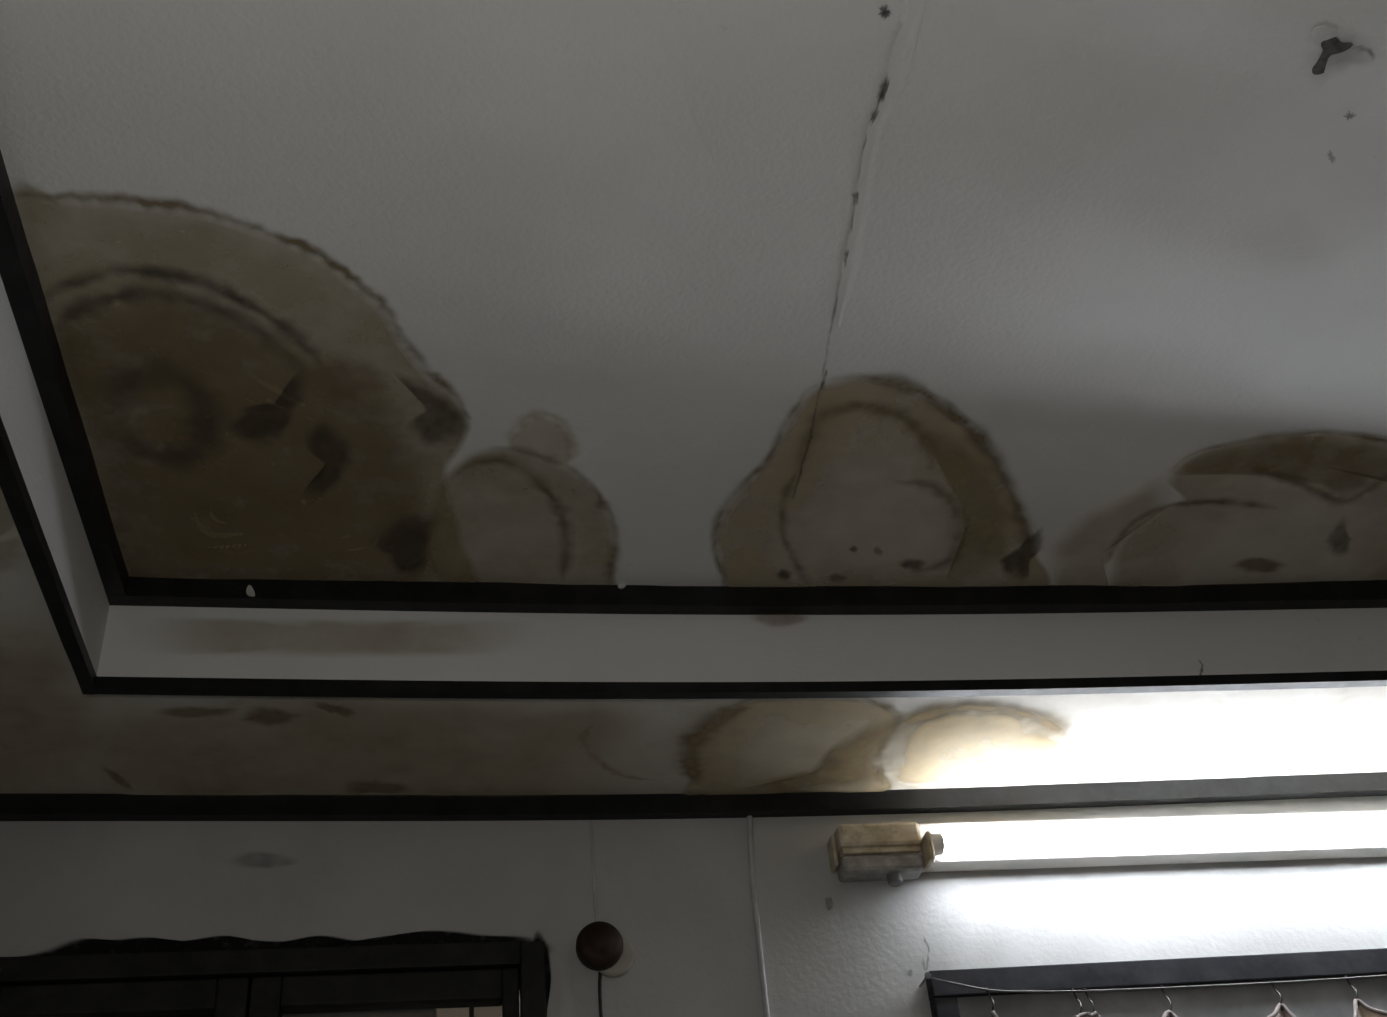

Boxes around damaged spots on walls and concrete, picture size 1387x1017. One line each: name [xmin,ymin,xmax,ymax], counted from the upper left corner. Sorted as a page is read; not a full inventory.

damp [36,196,617,583]
damp [714,377,1047,587]
damp [683,700,1064,795]